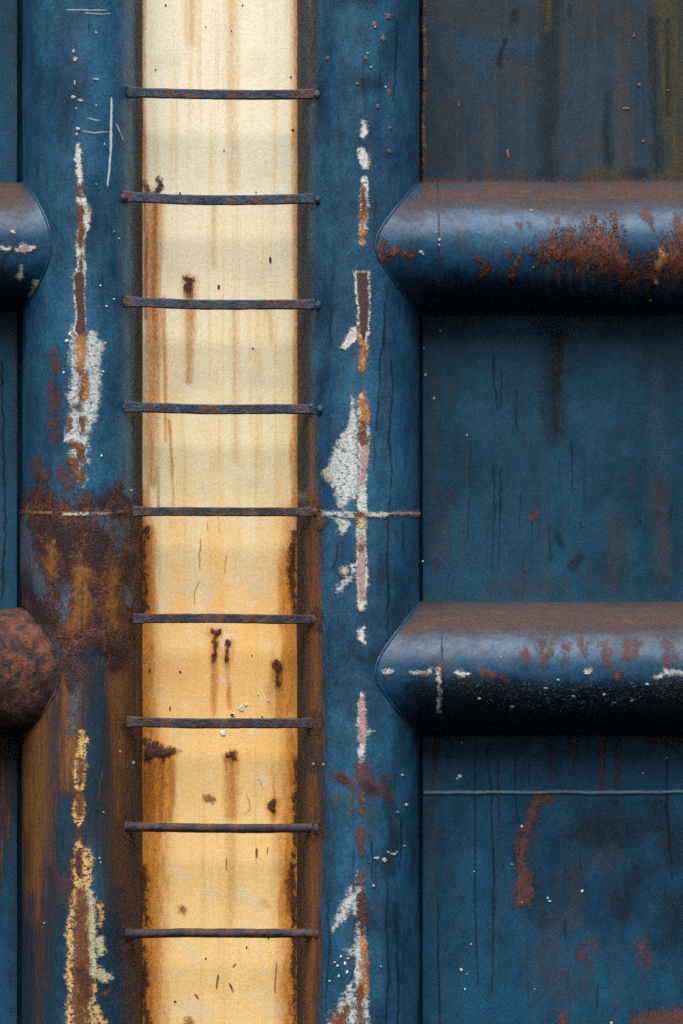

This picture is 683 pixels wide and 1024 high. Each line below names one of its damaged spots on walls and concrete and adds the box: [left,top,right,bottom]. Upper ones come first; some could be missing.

peeling [356,120,372,246]
rust [396,0,683,299]
peeling [63,127,106,487]
rust [182,275,195,377]
peeling [340,270,372,372]
rust [20,98,182,1024]
rust [210,628,233,717]
rust [267,0,394,1024]
peeling [321,391,420,612]
rust [401,602,683,680]
peeling [63,729,114,1024]
peeling [326,870,382,1024]